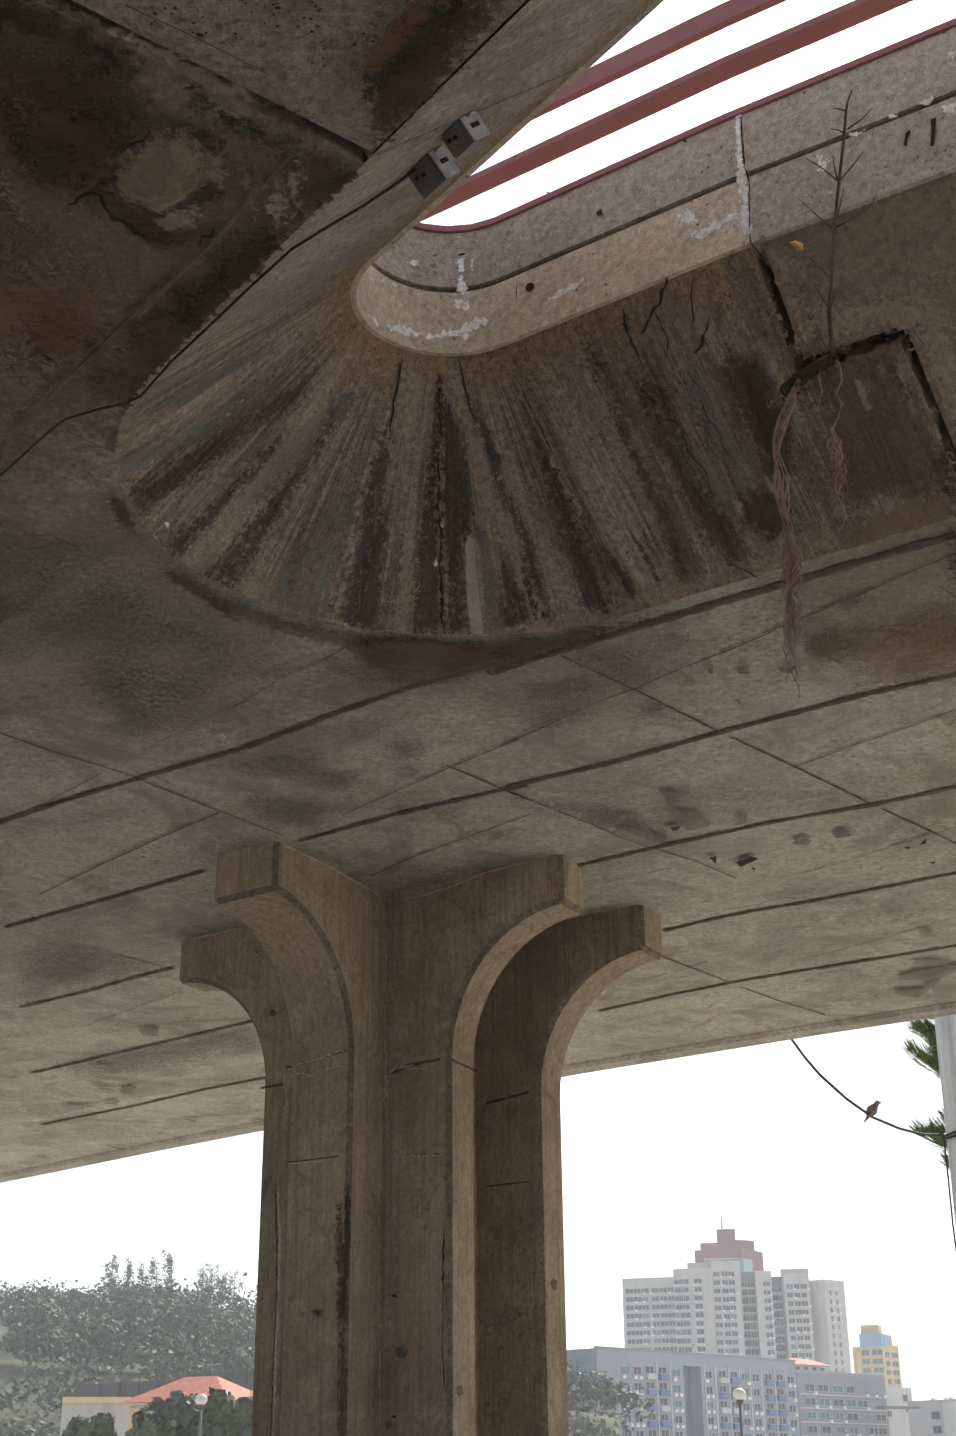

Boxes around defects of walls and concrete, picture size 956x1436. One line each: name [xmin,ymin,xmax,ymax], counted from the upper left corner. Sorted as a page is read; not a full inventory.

leakage [0,0,168,269]
leakage [150,0,506,150]
leakage [689,211,741,239]
leakage [815,154,833,172]
leakage [920,96,956,117]
leakage [83,79,659,687]
crack [588,277,736,506]
leakage [575,235,956,584]